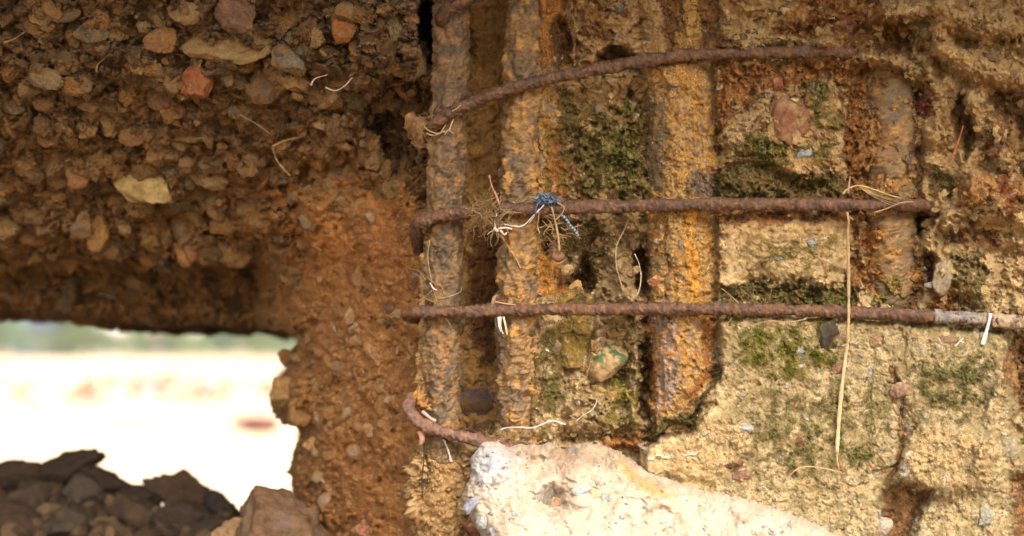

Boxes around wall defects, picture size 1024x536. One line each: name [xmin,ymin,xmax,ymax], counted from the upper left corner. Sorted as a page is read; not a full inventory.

spalling [548,20,574,69]
spalling [598,45,635,70]
corrosion [535,0,573,198]
corrosion [418,234,427,305]
corrosion [534,218,578,303]
spalling [633,246,650,297]
corrosion [599,0,972,453]
spalling [922,250,937,288]
corrosion [950,169,1024,218]
peeling [550,254,595,377]
corrosion [412,318,431,417]
spalling [637,344,652,420]